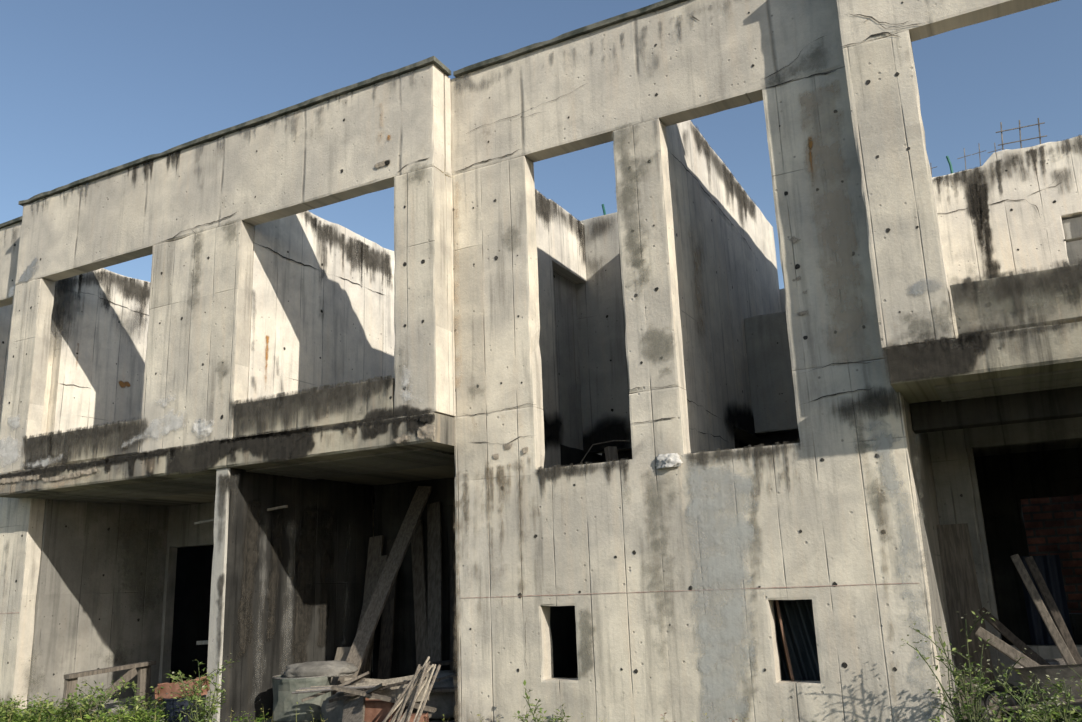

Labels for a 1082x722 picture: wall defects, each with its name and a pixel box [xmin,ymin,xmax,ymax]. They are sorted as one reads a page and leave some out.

crack [763,14,922,88]
water stain [618,131,637,216]
water stain [1057,135,1082,154]
water stain [305,213,391,282]
water stain [535,189,612,268]
water stain [626,229,648,284]
water stain [839,146,1082,573]
water stain [0,375,431,664]